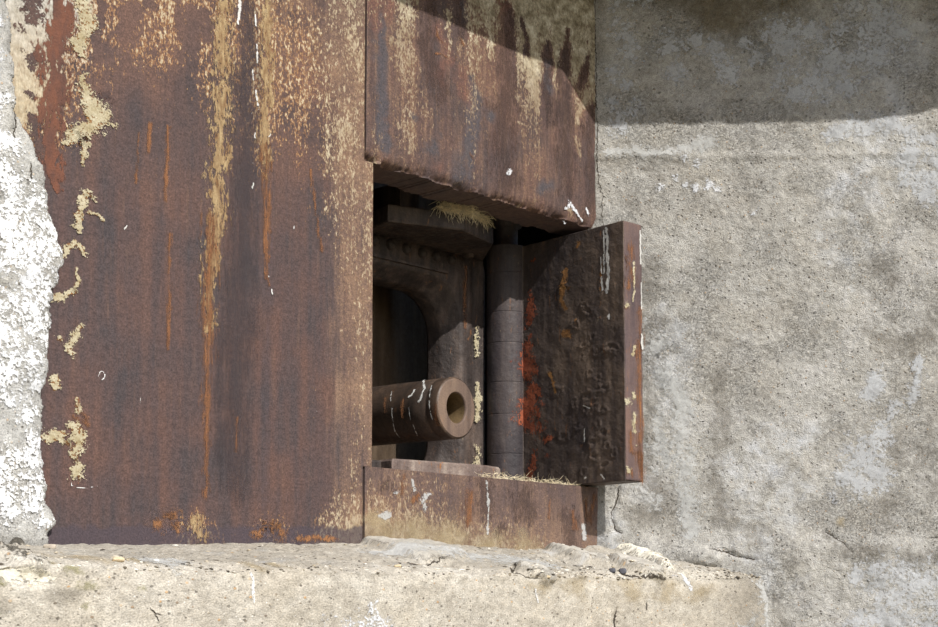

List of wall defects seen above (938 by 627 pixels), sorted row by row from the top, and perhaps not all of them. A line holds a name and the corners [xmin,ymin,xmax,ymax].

damp [0,89,63,528]
corrosion [13,0,77,194]
corrosion [95,90,114,104]
corrosion [199,0,239,498]
corrosion [256,0,277,286]
corrosion [510,289,556,481]
corrosion [559,267,570,311]
corrosion [629,309,645,484]
damp [655,174,723,193]
damp [602,0,922,169]
damp [821,110,938,213]
crack [622,572,666,580]